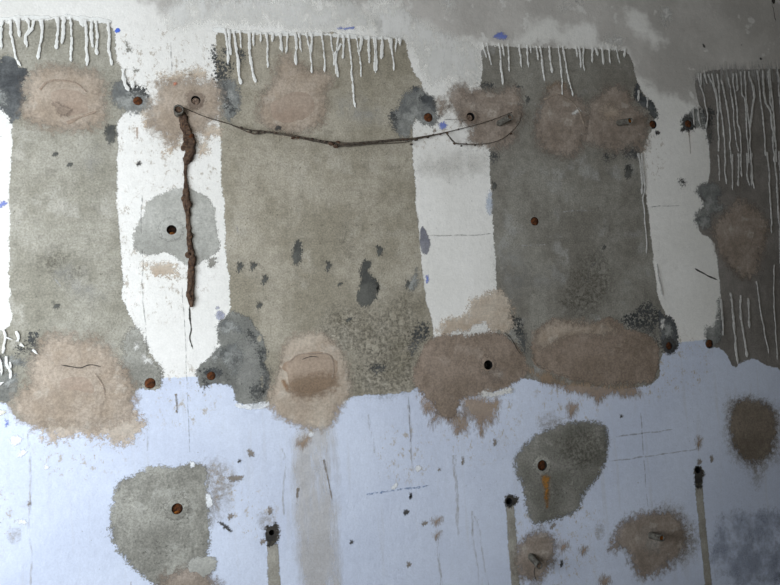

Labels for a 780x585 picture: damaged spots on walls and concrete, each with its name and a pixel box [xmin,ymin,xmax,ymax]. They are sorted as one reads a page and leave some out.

damp [0,54,29,124]
damp [108,80,152,114]
damp [208,44,248,123]
damp [386,85,440,141]
damp [633,84,658,119]
damp [687,105,715,145]
corrosion [179,112,196,307]
damp [695,182,724,231]
damp [0,329,40,387]
damp [195,310,275,410]
damp [408,320,433,356]
damp [618,298,680,352]